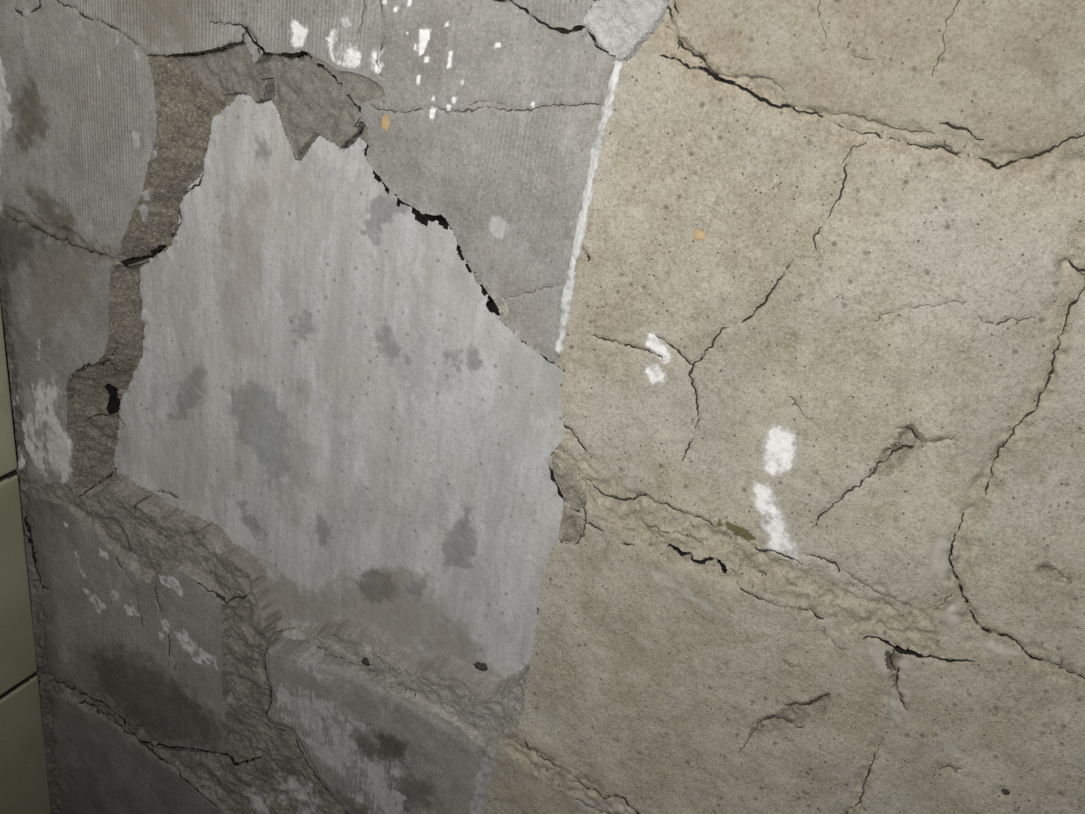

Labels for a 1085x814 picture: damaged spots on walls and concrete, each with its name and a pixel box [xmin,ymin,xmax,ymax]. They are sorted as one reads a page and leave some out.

crack [4,0,612,364]
crack [660,0,1085,249]
spalling [21,20,566,814]
crack [592,262,791,461]
crack [816,426,955,525]
crack [874,300,1036,325]
crack [985,259,1085,495]
crack [549,468,1085,710]
crack [55,679,262,807]
crack [523,738,639,814]
crack [738,693,830,753]
crack [846,731,889,814]